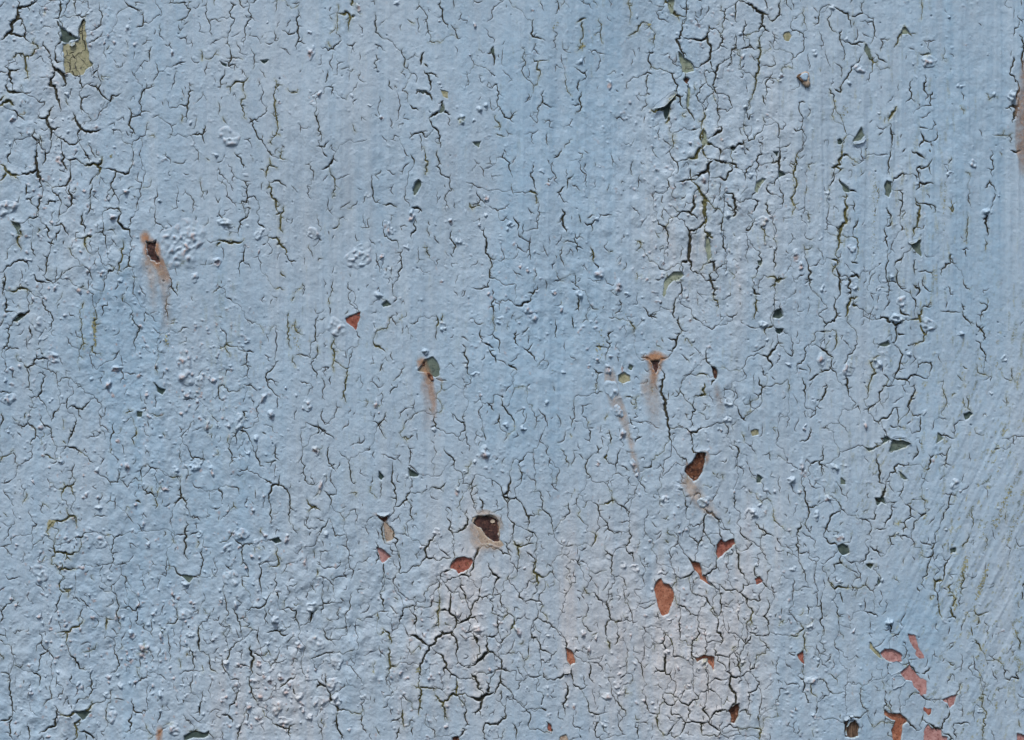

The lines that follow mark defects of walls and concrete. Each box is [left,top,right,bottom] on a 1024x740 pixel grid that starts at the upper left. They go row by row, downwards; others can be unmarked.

crack [465,0,616,145]
crack [980,0,1024,248]
corrosion [141,233,167,279]
crack [169,0,458,410]
crack [467,140,609,379]
corrosion [646,352,665,383]
crack [179,398,298,534]
peeling [685,453,705,481]
peeling [472,515,503,547]
peeling [654,579,674,616]
peeling [716,539,735,558]
peeling [870,634,947,740]